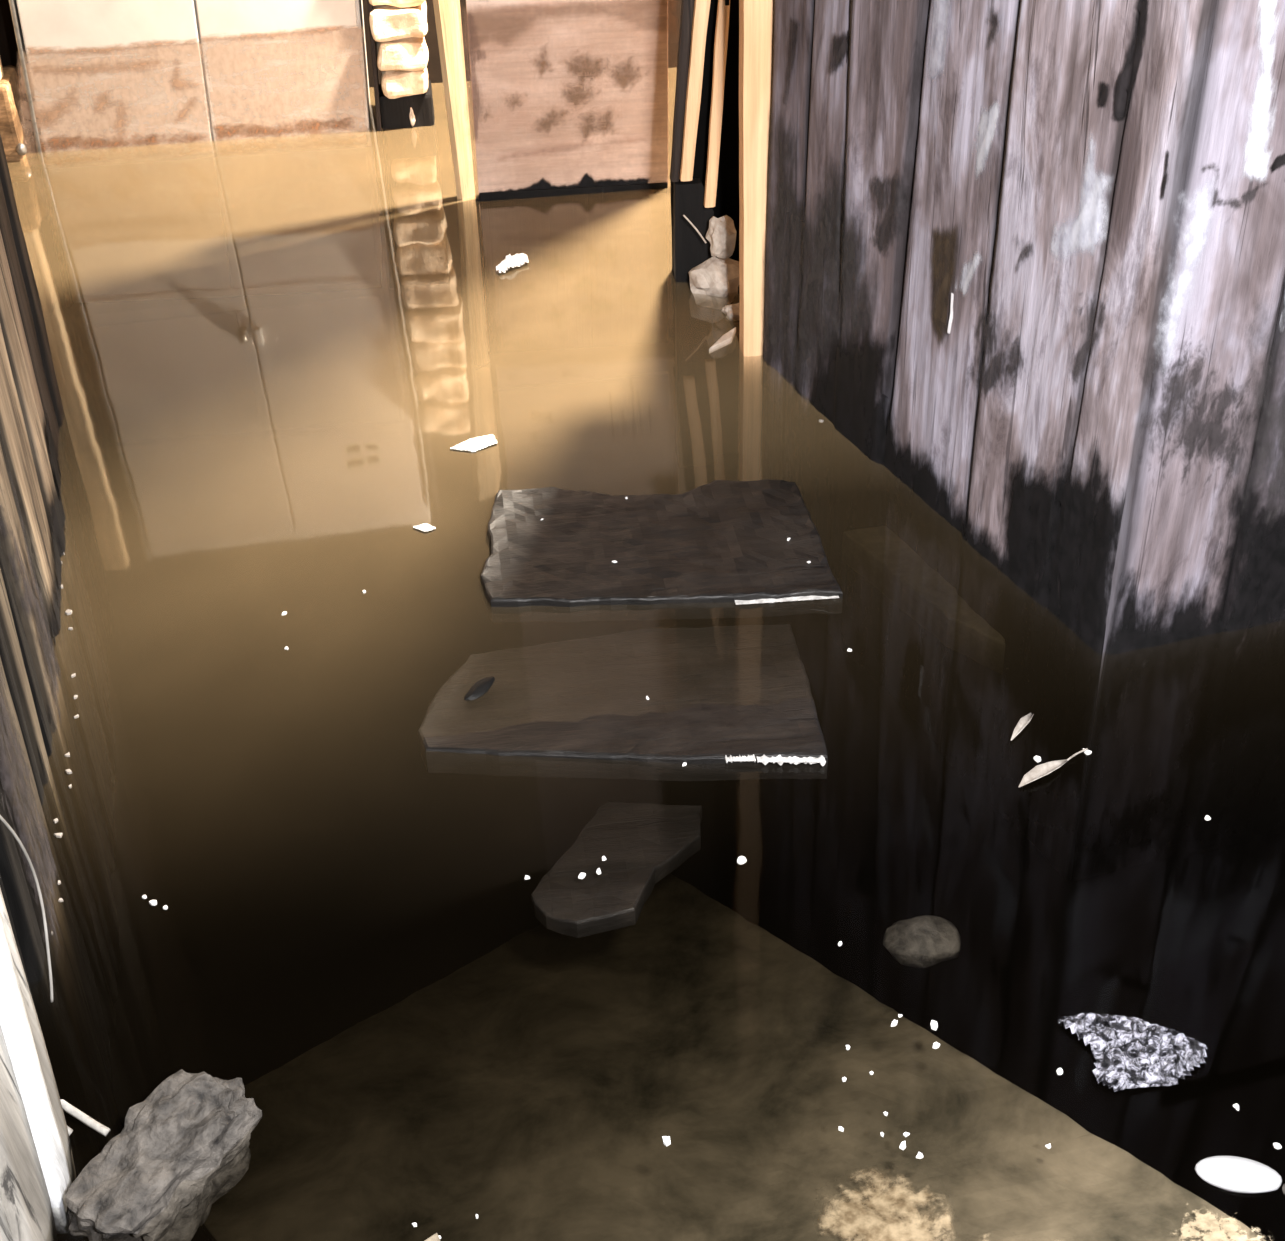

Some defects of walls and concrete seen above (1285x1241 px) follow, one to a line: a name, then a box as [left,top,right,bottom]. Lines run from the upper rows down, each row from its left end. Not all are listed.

leakage [988,13,998,44]
leakage [28,48,119,71]
leakage [542,59,600,128]
leakage [616,64,638,87]
leakage [783,19,798,99]
leakage [829,34,849,73]
leakage [763,103,1285,869]